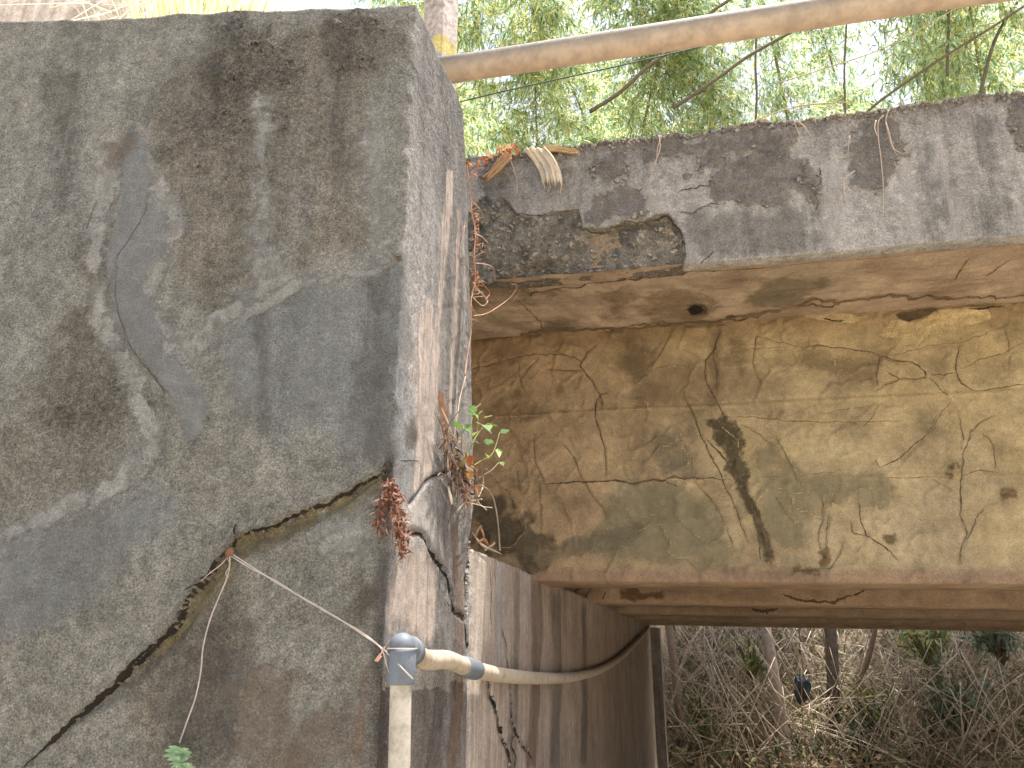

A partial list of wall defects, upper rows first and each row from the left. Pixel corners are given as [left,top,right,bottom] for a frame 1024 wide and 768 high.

crack [115,196,174,401]
spalling [468,125,823,284]
leakage [708,413,773,563]
crack [471,258,1024,571]
crack [23,460,450,768]
crack [408,530,469,649]
crack [487,565,533,767]